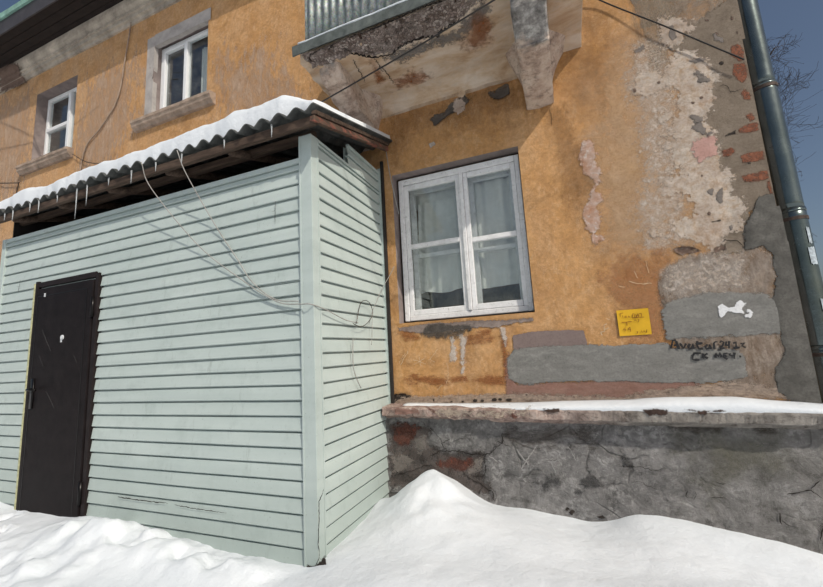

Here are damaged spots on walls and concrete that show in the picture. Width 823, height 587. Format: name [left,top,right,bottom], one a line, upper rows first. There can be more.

spalling [301,0,481,69]
corrosion [469,17,492,47]
corrosion [397,73,427,87]
flaking render [430,95,470,126]
flaking render [488,84,510,100]
peeling [625,0,776,294]
peeling [578,139,605,244]
damp [421,323,472,374]
crack [393,433,509,500]